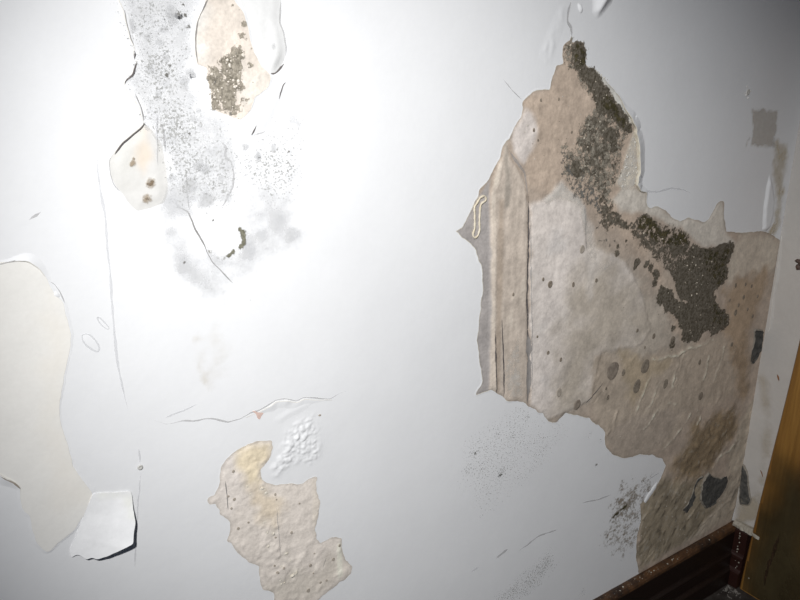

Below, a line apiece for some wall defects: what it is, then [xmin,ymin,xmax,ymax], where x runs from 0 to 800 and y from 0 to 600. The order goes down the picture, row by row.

peeling [0,253,135,559]
peeling [109,0,168,211]
mould [127,1,301,241]
peeling [192,0,286,135]
mould [226,227,260,259]
peeling [456,35,780,573]
mould [561,36,735,348]
peeling [206,439,353,600]
mould [605,480,650,556]